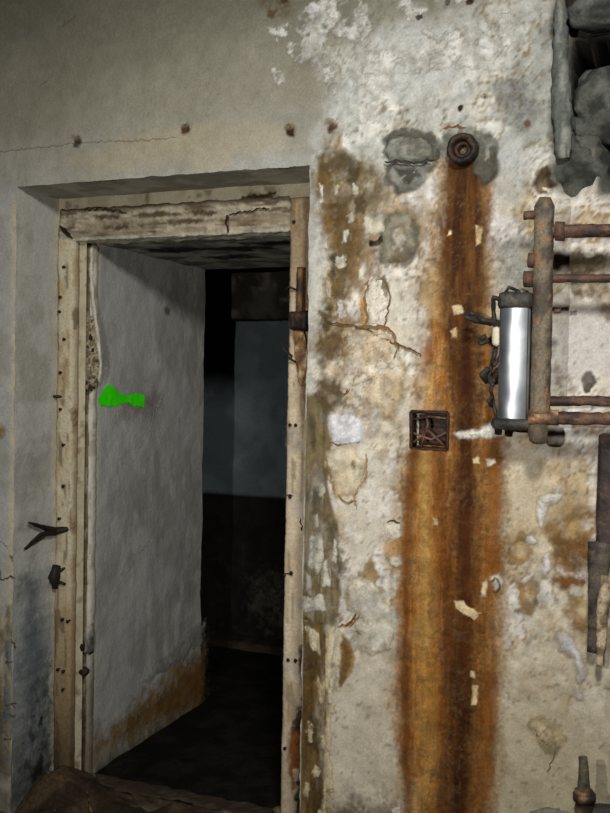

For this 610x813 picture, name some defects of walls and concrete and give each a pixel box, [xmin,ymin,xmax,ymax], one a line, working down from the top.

peeling [268,0,515,124]
crack [0,137,176,152]
spalling [532,165,557,194]
spalling [143,210,216,224]
corrosion [395,147,504,813]
peeling [293,394,397,813]
corrosion [289,731,300,789]